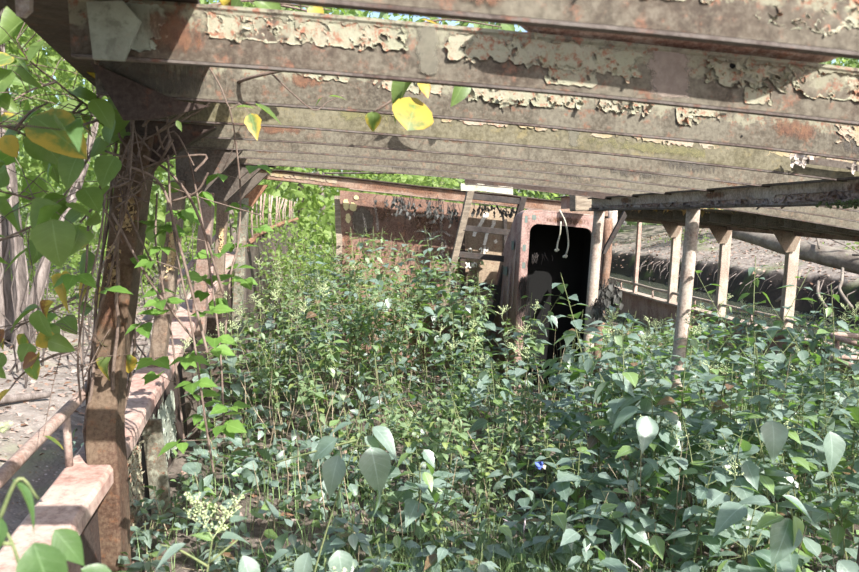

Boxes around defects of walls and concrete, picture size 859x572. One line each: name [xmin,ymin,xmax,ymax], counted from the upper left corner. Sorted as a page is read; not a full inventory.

peeling [204,11,409,51]
peeling [755,0,859,36]
peeling [444,32,645,110]
peeling [705,56,859,106]
peeling [676,107,727,127]
peeling [835,124,859,146]
corrosion [372,201,395,221]
corrosion [411,210,446,233]